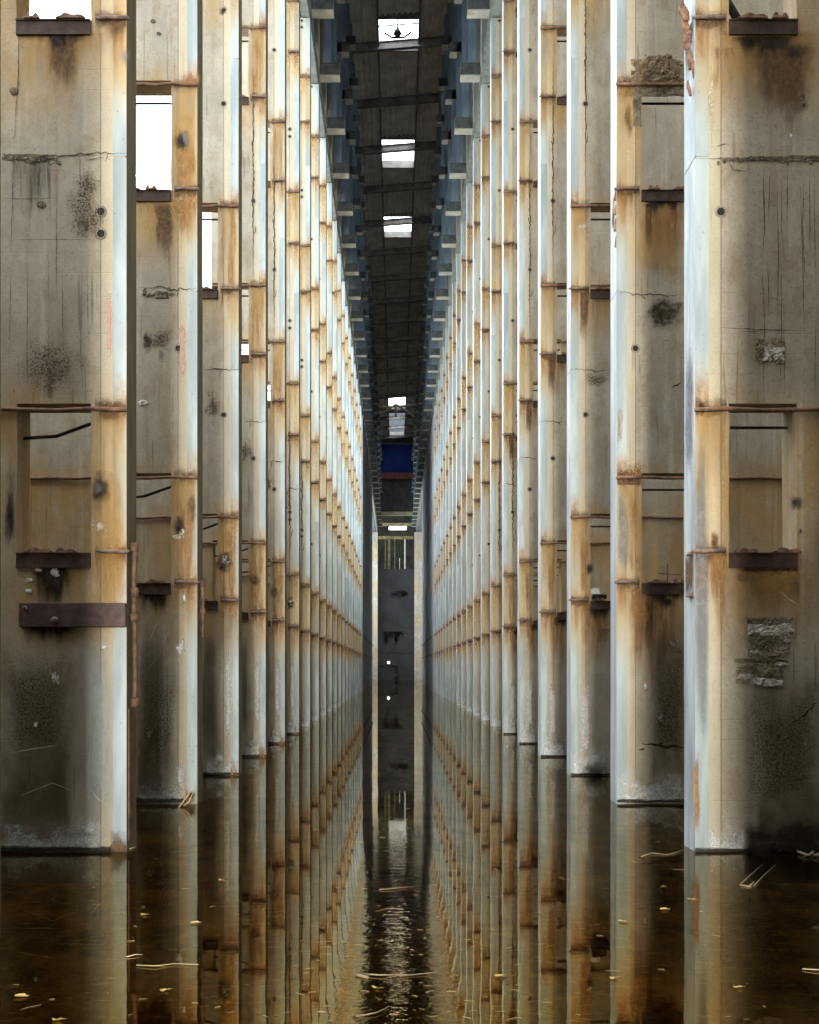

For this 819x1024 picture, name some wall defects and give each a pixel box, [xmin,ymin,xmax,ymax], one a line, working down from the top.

crack [2,42,125,165]
crack [582,0,590,181]
rust [152,78,198,245]
crack [697,144,786,171]
crack [139,286,198,300]
spalling [756,337,785,364]
crack [640,742,684,750]
leakage [617,777,684,803]
leakage [1,823,111,852]
leakage [695,832,819,852]